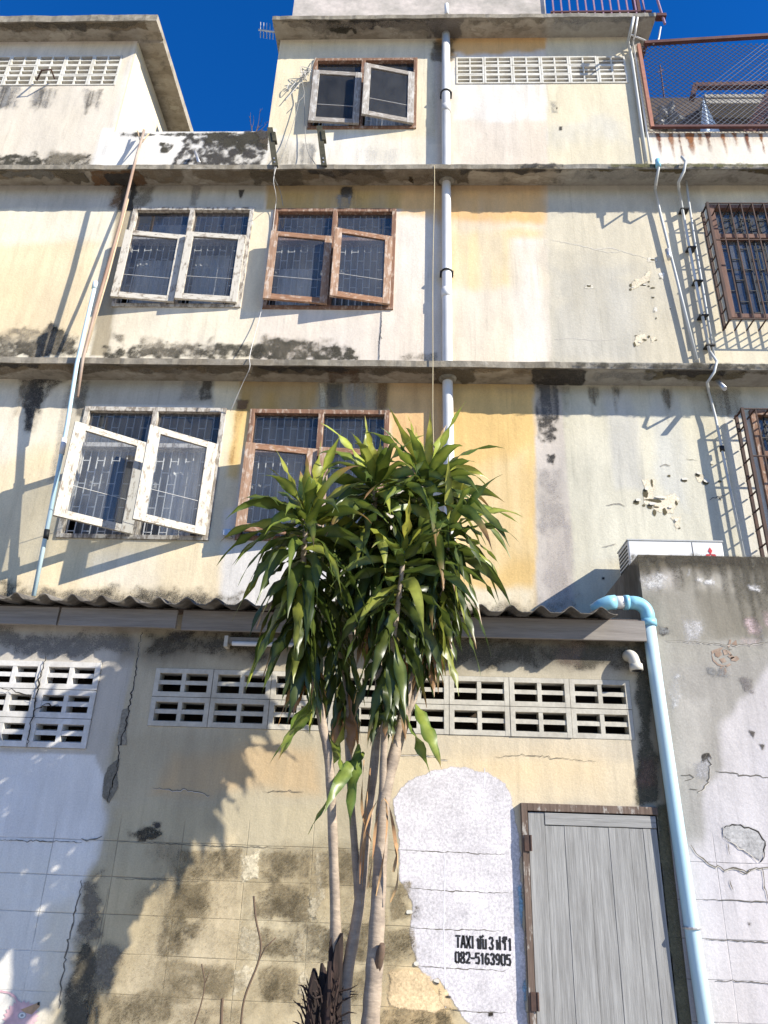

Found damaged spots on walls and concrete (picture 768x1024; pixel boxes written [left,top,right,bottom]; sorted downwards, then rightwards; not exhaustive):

damp [0,130,563,211]
rust [655,132,765,154]
damp [0,323,768,442]
peeling [633,479,681,529]
crack [102,633,143,803]
crack [681,754,768,793]
crack [691,844,768,903]
spalling [723,824,766,863]
crack [59,881,82,1009]
damp [64,822,373,1024]
damp [384,881,420,982]
peeling [387,962,453,1013]